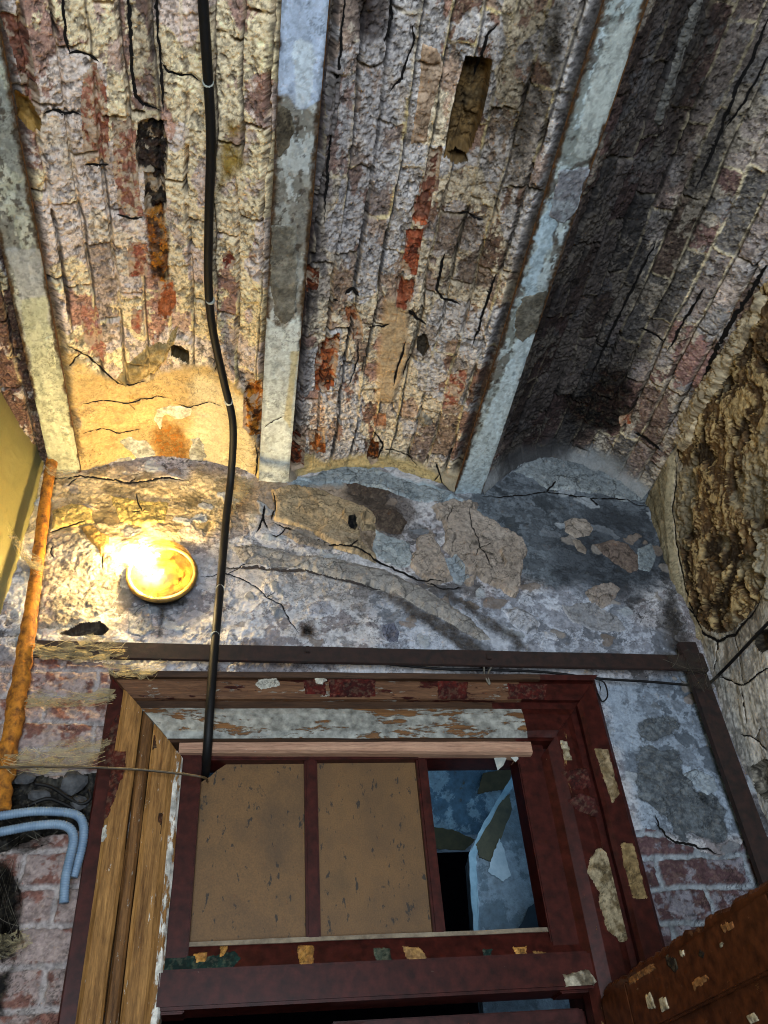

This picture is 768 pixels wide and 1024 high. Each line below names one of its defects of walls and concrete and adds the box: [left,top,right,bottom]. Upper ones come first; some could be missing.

crack [61,0,99,62]
spalling [80,62,169,216]
rust [147,203,170,282]
crack [127,0,201,111]
spalling [394,43,492,310]
crack [55,475,188,512]
crack [68,346,220,408]
crack [206,417,464,632]
flaking render [271,412,528,598]
flaking render [673,281,768,634]
flaking render [0,659,131,1024]
flaking render [620,716,759,973]